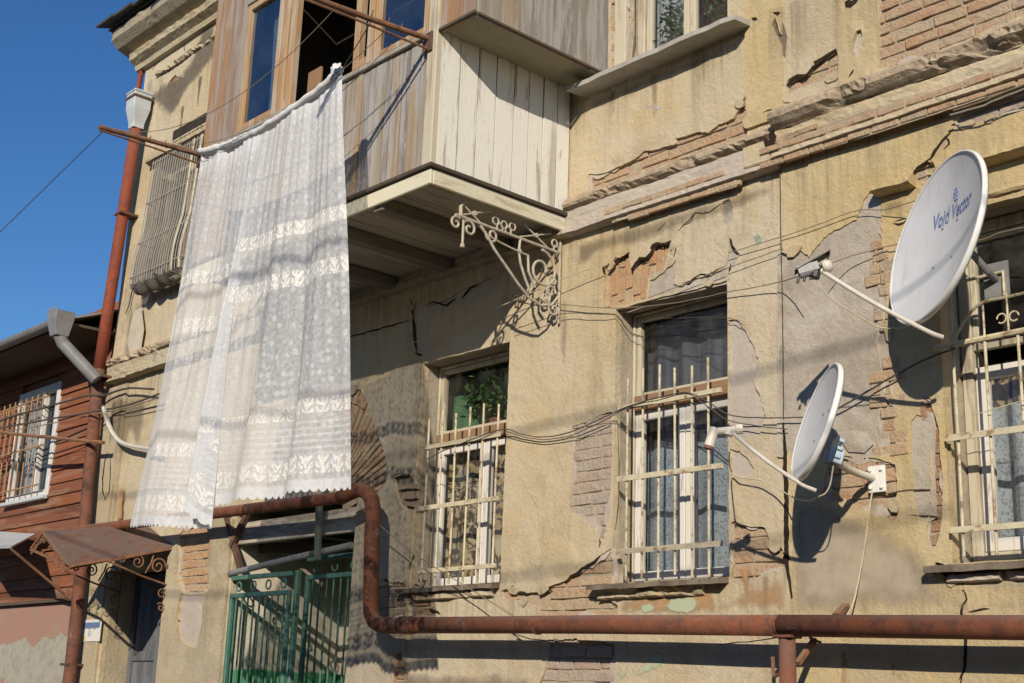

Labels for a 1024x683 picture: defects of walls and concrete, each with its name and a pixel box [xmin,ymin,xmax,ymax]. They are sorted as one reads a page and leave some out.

spalling [879,0,1024,69]
spalling [589,51,1024,227]
crack [913,129,953,173]
spalling [607,244,738,313]
crack [350,285,478,356]
peeling [728,193,954,550]
spalling [343,385,424,513]
spalling [502,406,624,616]
spalling [179,526,210,647]
crack [512,538,601,594]
spalling [728,516,785,583]
peeling [0,632,68,683]